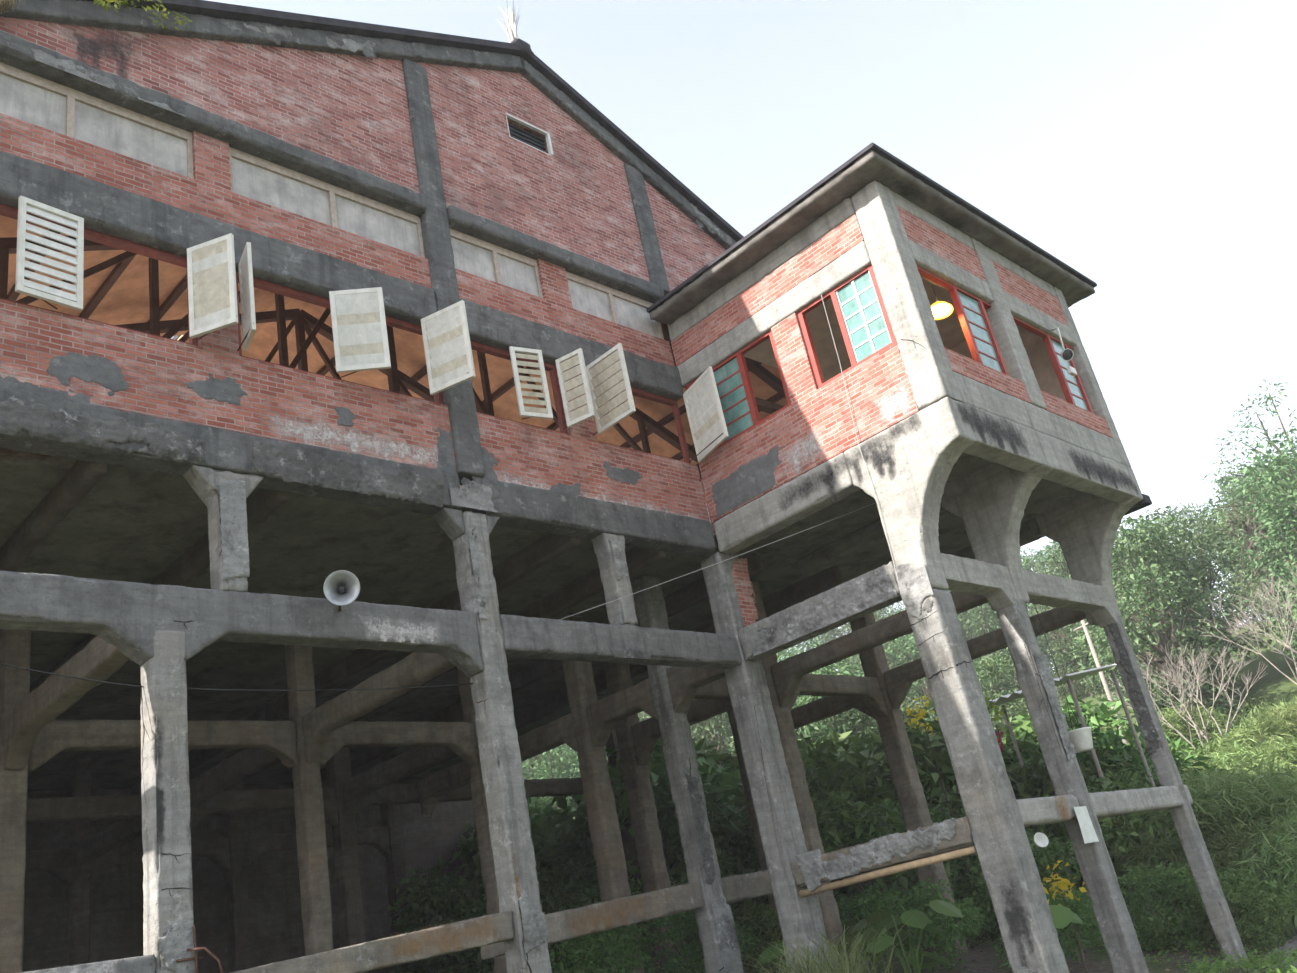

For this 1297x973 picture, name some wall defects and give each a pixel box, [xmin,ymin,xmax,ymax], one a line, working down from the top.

spalling [0,382,208,464]
leakage [959,405,1026,454]
spalling [821,818,956,880]
leakage [1002,890,1033,967]